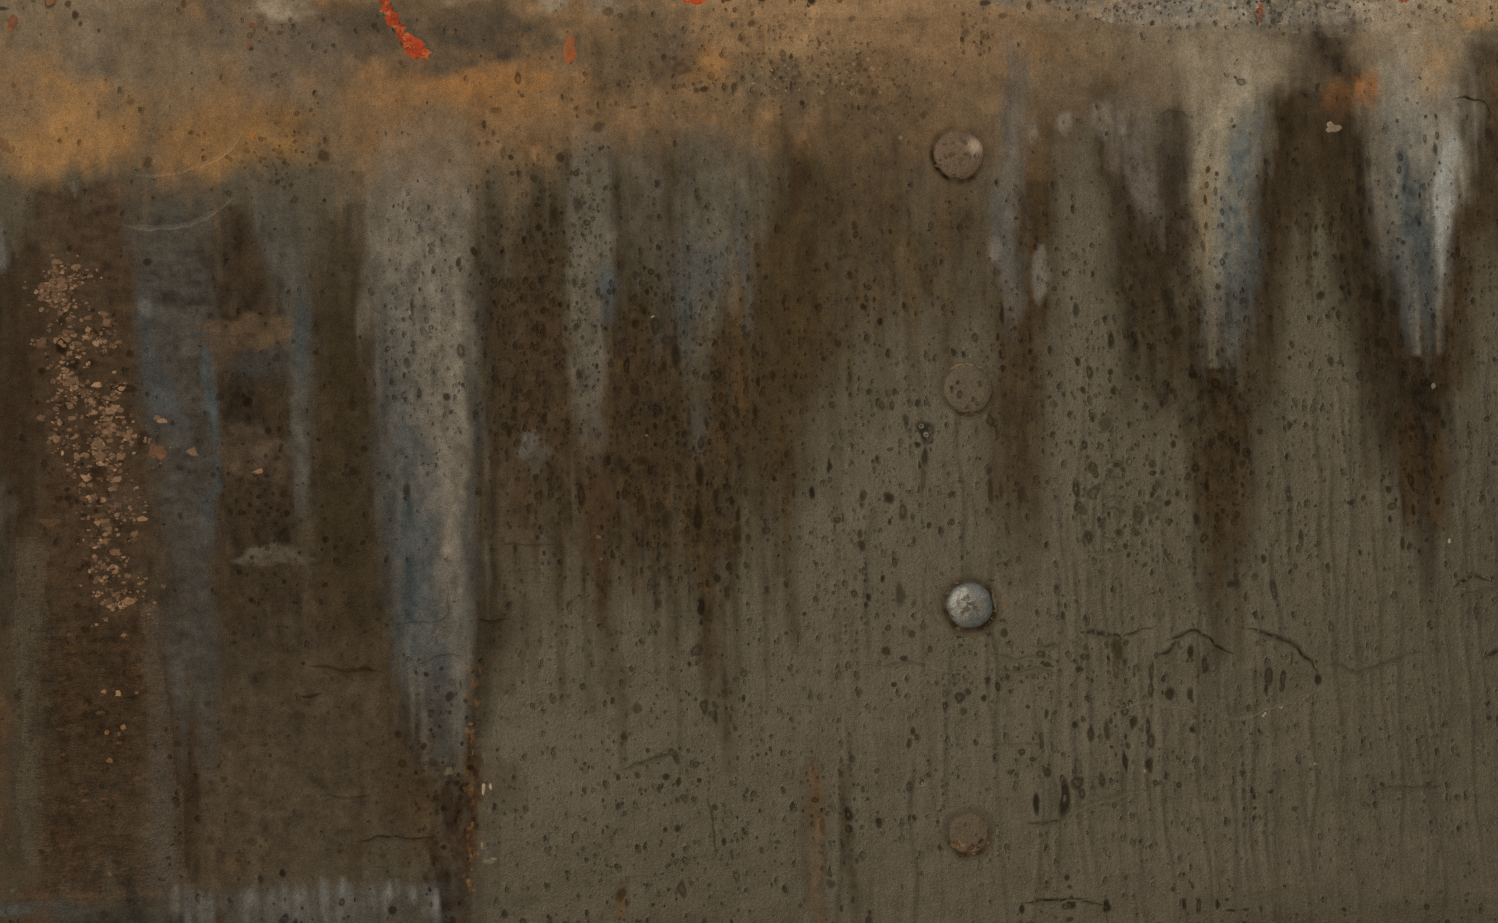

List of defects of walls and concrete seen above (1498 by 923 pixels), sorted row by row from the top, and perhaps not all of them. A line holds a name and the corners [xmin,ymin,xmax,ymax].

leakage [0,0,574,801]
corrosion [0,61,753,896]
leakage [543,0,1498,499]
corrosion [612,7,1479,710]